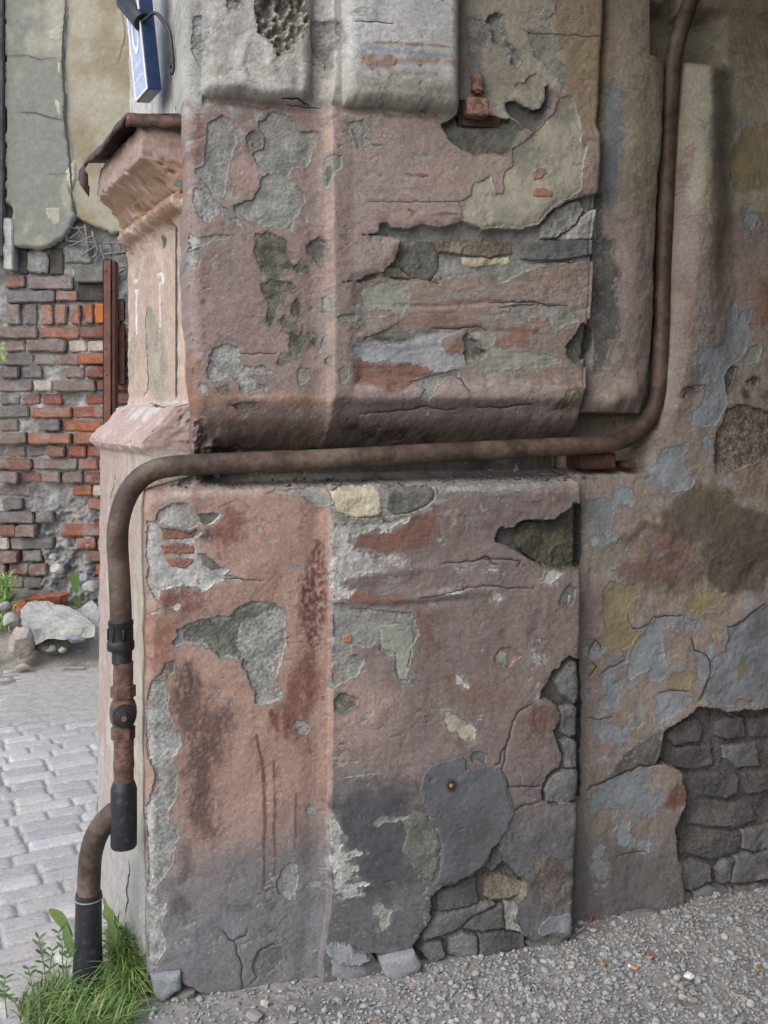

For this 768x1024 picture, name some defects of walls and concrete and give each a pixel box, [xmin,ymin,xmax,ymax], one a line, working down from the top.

flaking render [320,3,627,402]
flaking render [145,502,243,614]
flaking render [171,601,287,705]
flaking render [267,482,555,714]
crack [420,556,528,599]
flaking render [494,502,582,607]
corrosion [255,734,276,890]
water stain [343,788,409,891]
crack [496,704,541,811]
flaking render [494,616,768,901]
crack [222,930,275,990]
flaking render [325,843,575,981]